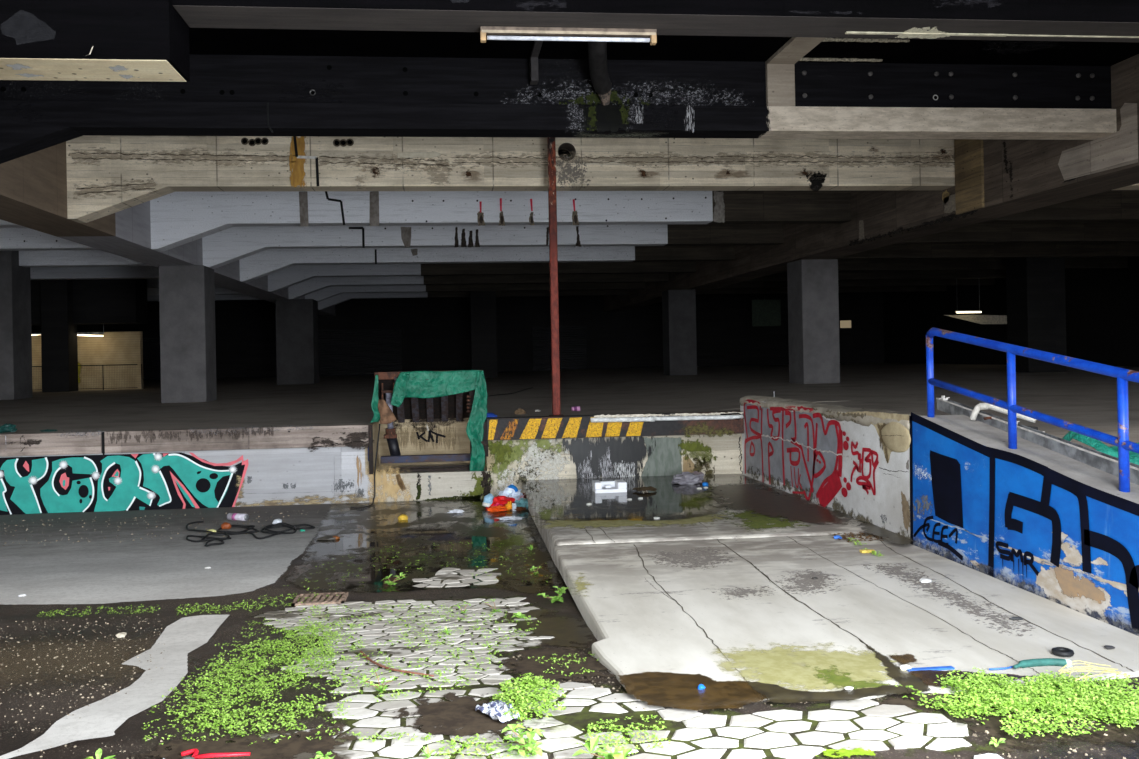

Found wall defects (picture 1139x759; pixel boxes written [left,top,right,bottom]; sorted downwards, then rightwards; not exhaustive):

peeling [1,10,56,45]
water stain [501,59,754,138]
rust [289,136,306,187]
spalling [838,411,909,463]
water stain [494,436,656,496]
peeling [901,491,934,531]
peeling [1001,532,1127,624]